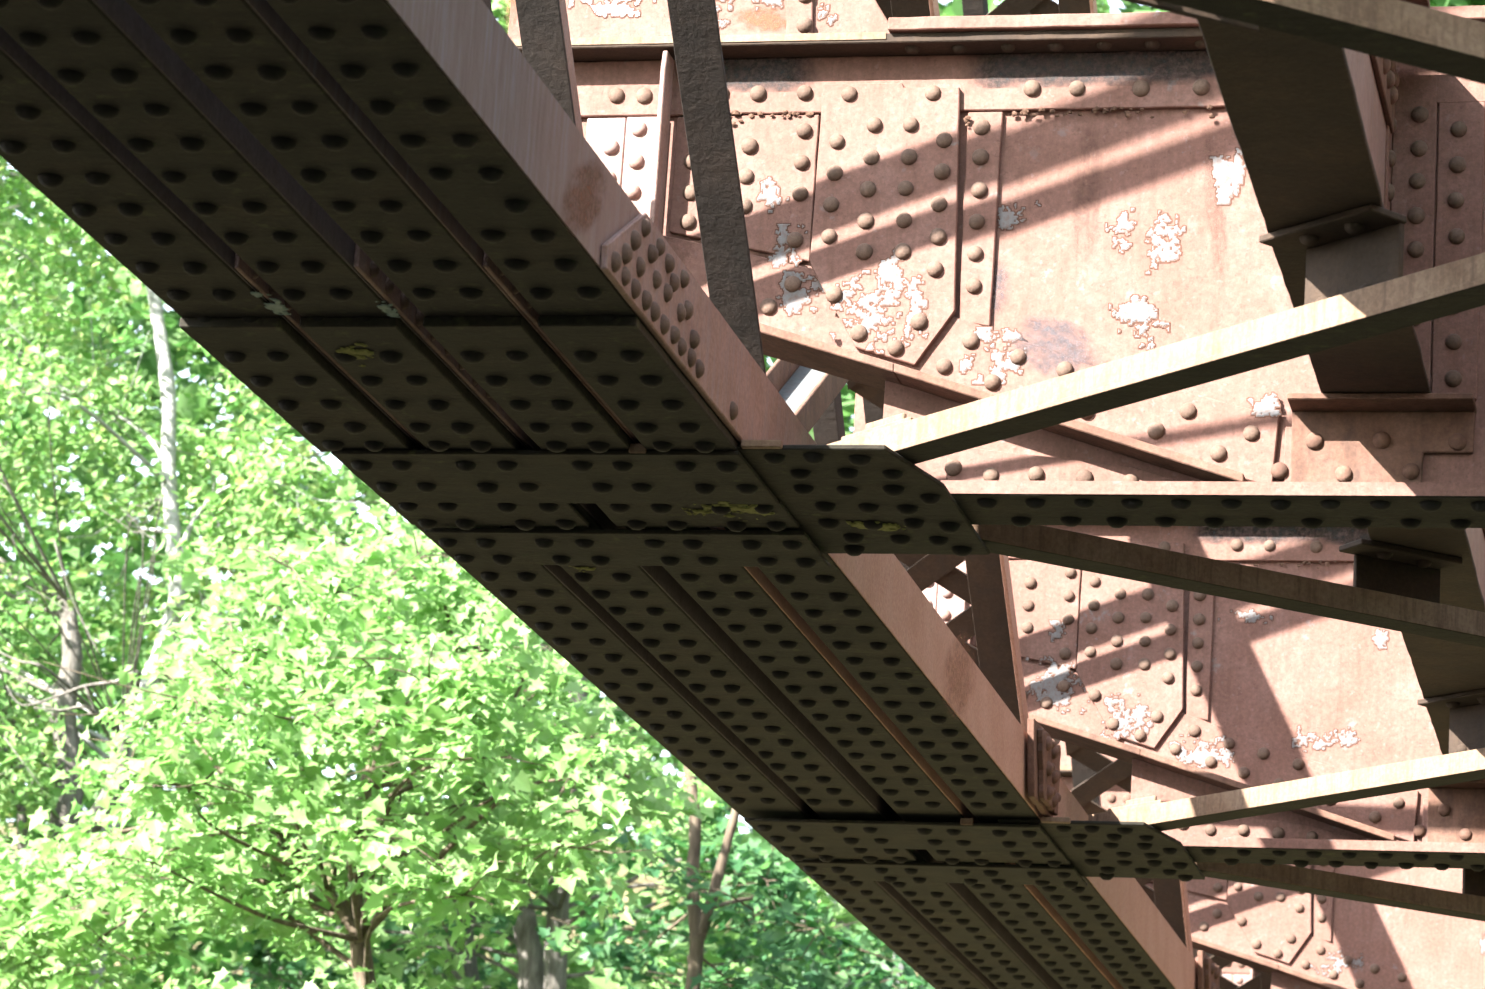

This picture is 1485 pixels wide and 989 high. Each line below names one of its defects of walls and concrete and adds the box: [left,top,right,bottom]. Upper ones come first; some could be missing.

peeling [568,0,657,18]
peeling [715,0,784,29]
peeling [816,2,838,27]
peeling [1208,147,1246,206]
peeling [756,176,929,354]
peeling [997,200,1042,231]
peeling [1104,207,1187,275]
peeling [1108,294,1170,351]
peeling [959,326,1027,385]
peeling [1025,620,1154,740]
peeling [1169,733,1235,769]
peeling [1291,725,1361,753]